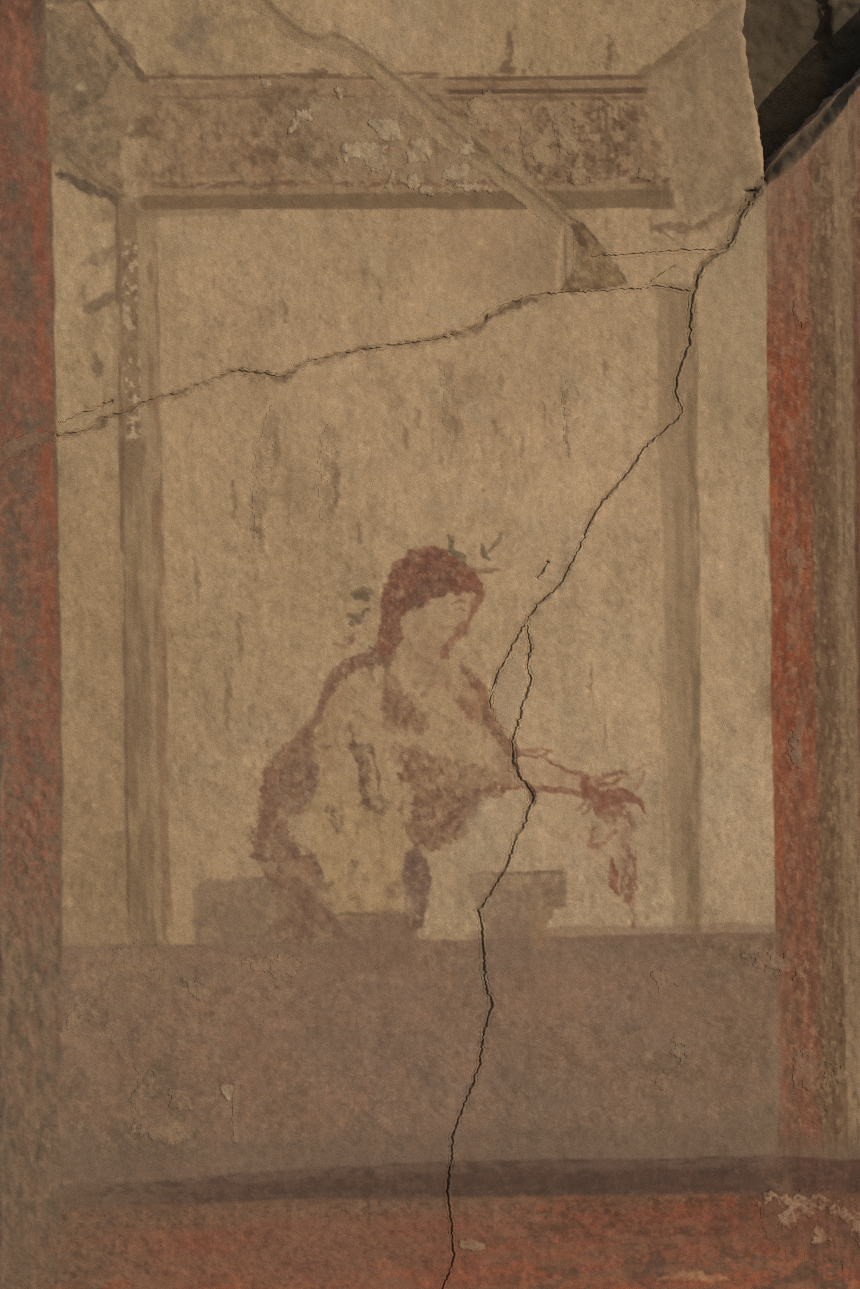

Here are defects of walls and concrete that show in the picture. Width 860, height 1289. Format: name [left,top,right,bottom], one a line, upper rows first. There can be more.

crack [0,173,767,1289]
peeling [755,1182,860,1271]